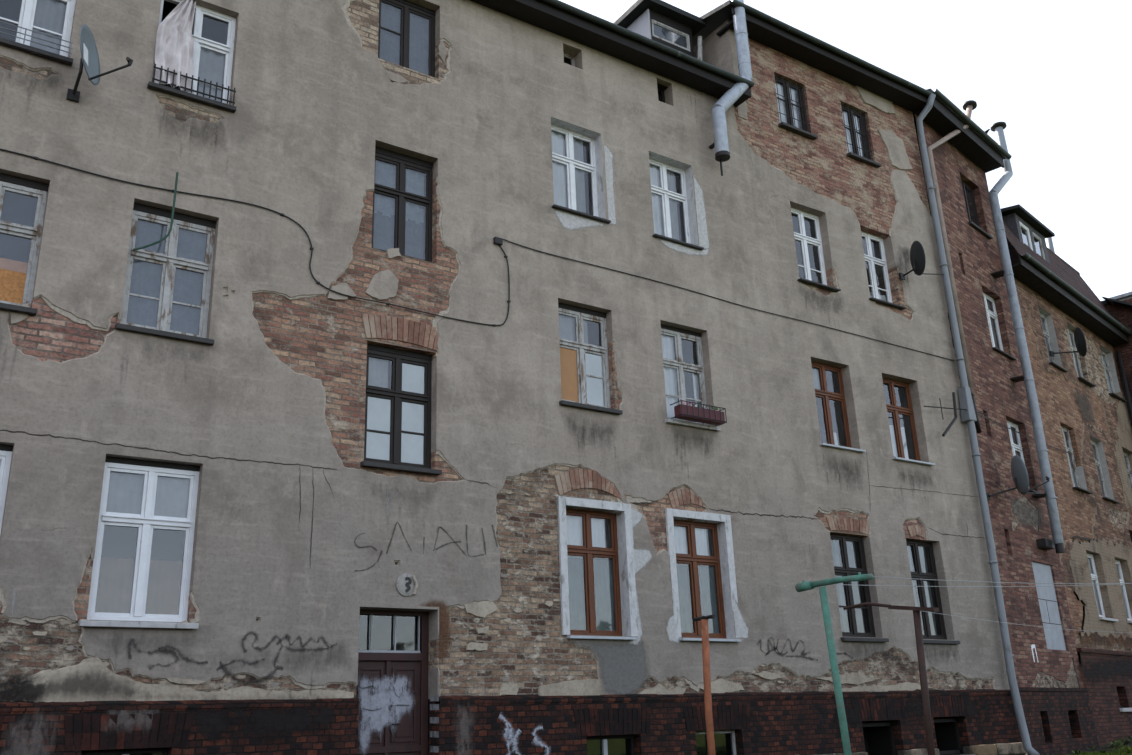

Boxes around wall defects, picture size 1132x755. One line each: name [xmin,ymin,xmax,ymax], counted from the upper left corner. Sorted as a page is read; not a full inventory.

flaking render [341,0,452,85]
flaking render [734,38,931,240]
flaking render [7,294,121,364]
flaking render [251,176,465,484]
crack [0,429,337,566]
flaking render [0,548,357,702]
flaking render [428,463,708,696]
flaking render [630,646,996,694]